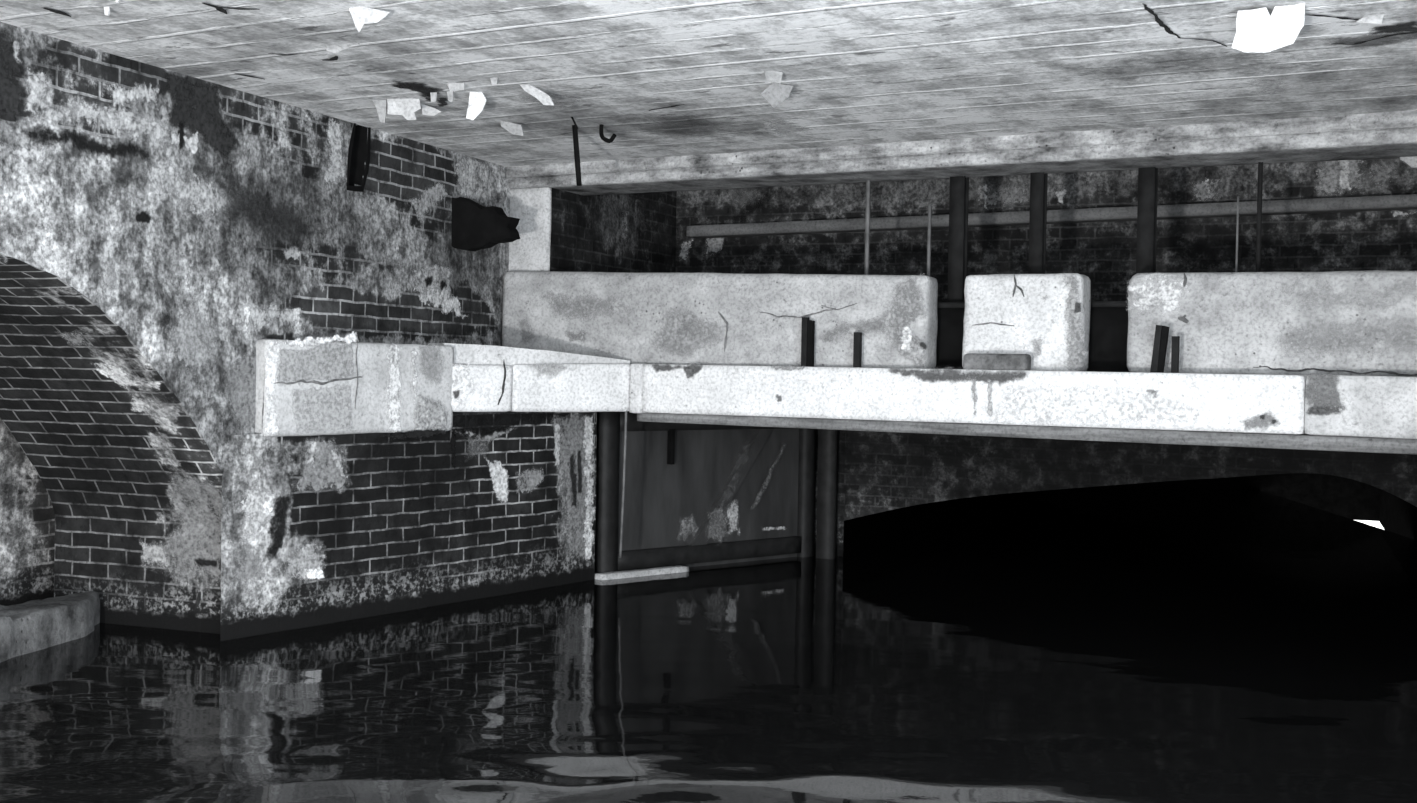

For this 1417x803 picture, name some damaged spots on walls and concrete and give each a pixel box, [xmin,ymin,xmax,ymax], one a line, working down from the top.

peeling [325,6,390,53]
crack [1143,4,1227,47]
peeling [1231,3,1305,53]
peeling [520,85,554,105]
damp [0,30,322,260]
damp [324,119,345,182]
spalling [346,78,498,192]
peeling [500,121,524,136]
damp [411,183,447,215]
damp [63,333,87,345]
damp [160,299,357,434]
damp [141,440,348,582]